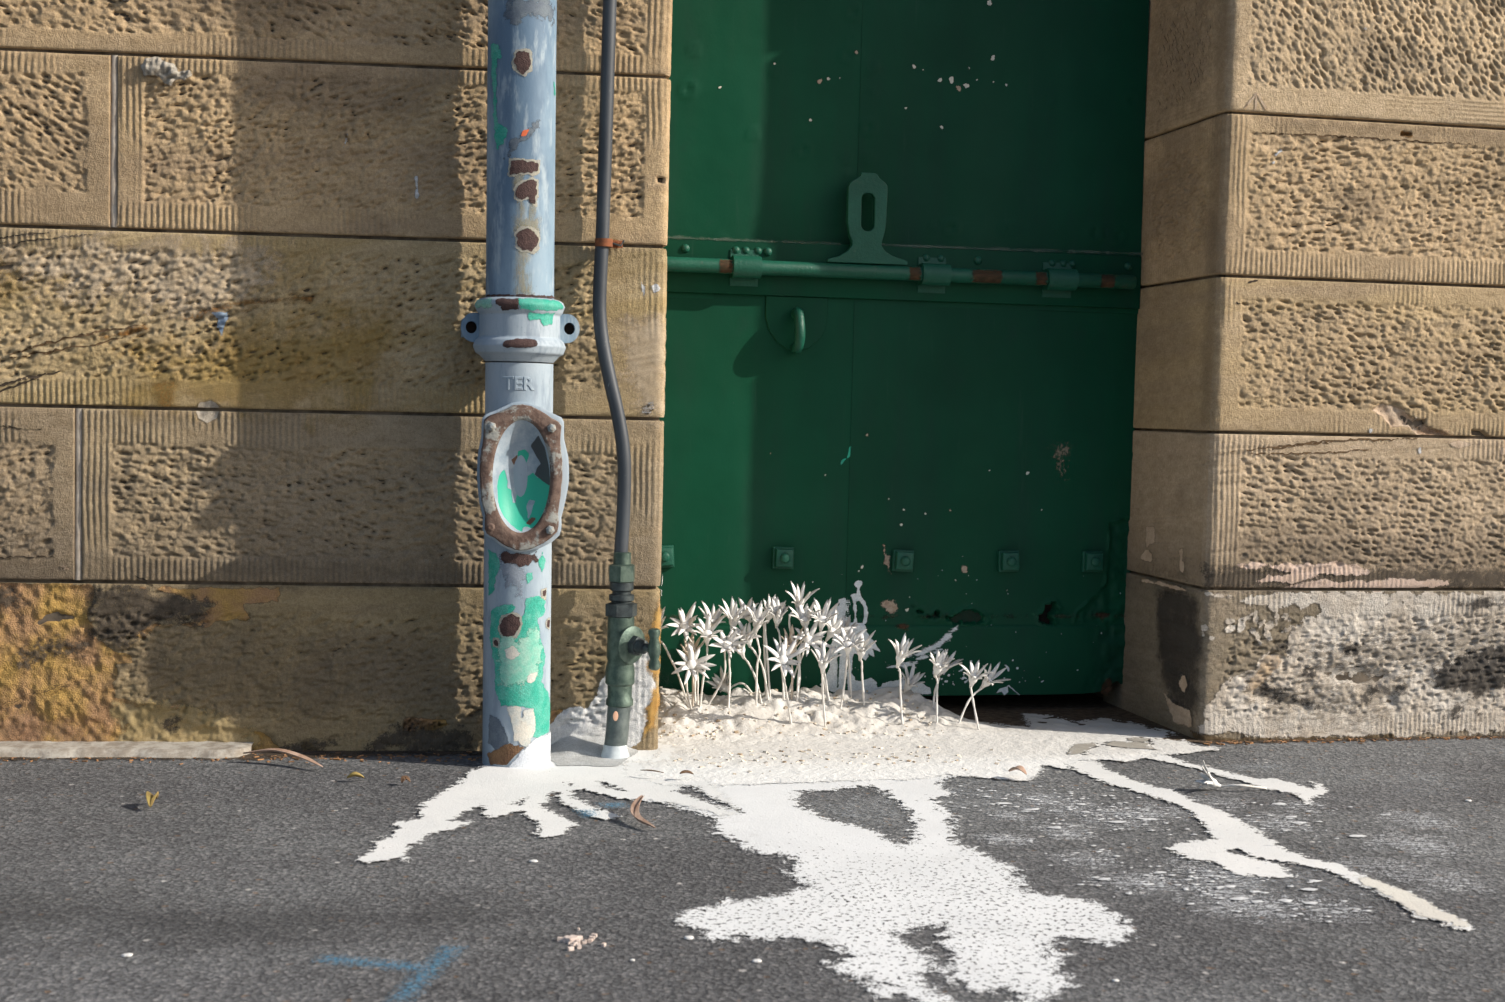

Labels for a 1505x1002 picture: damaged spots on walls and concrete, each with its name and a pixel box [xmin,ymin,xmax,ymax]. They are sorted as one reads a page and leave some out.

rust [514,51,531,75]
rust [509,159,539,204]
crack [0,232,96,245]
rust [516,228,539,251]
peeling [1197,560,1505,739]